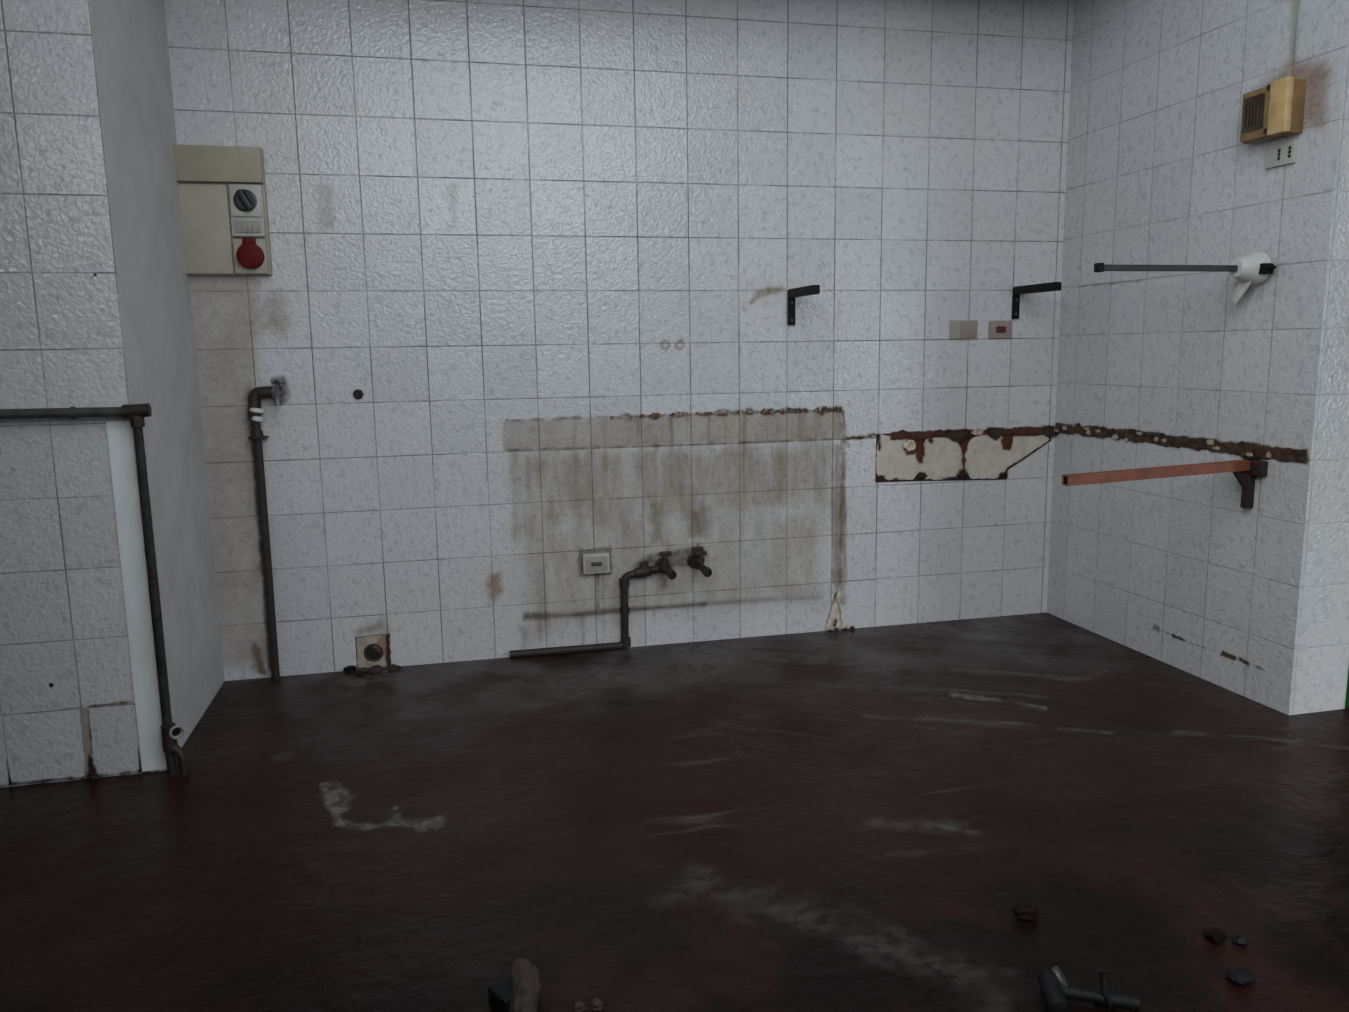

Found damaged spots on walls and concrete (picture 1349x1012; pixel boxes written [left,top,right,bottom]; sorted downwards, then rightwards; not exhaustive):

spalling [875,434,1049,482]